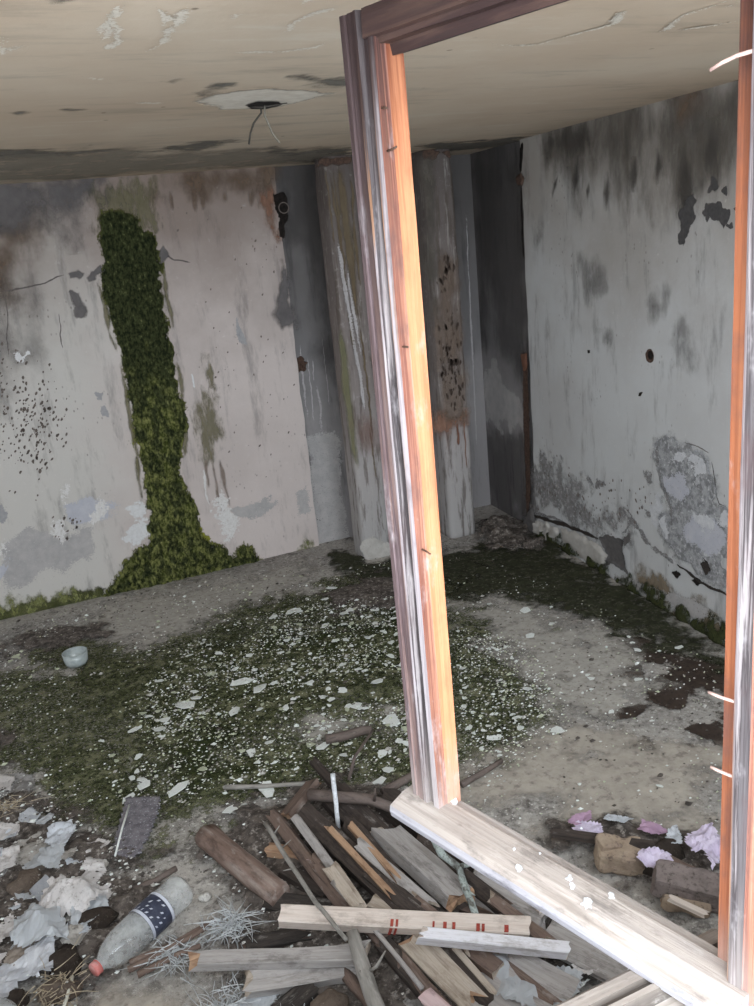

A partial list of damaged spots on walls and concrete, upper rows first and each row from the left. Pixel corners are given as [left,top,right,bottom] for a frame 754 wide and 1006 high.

damp [166,140,232,151]
damp [0,178,105,299]
peeling [678,176,735,245]
damp [0,342,68,480]
peeling [0,496,119,592]
crack [535,513,598,539]
crack [623,510,726,595]
spalling [649,435,728,587]